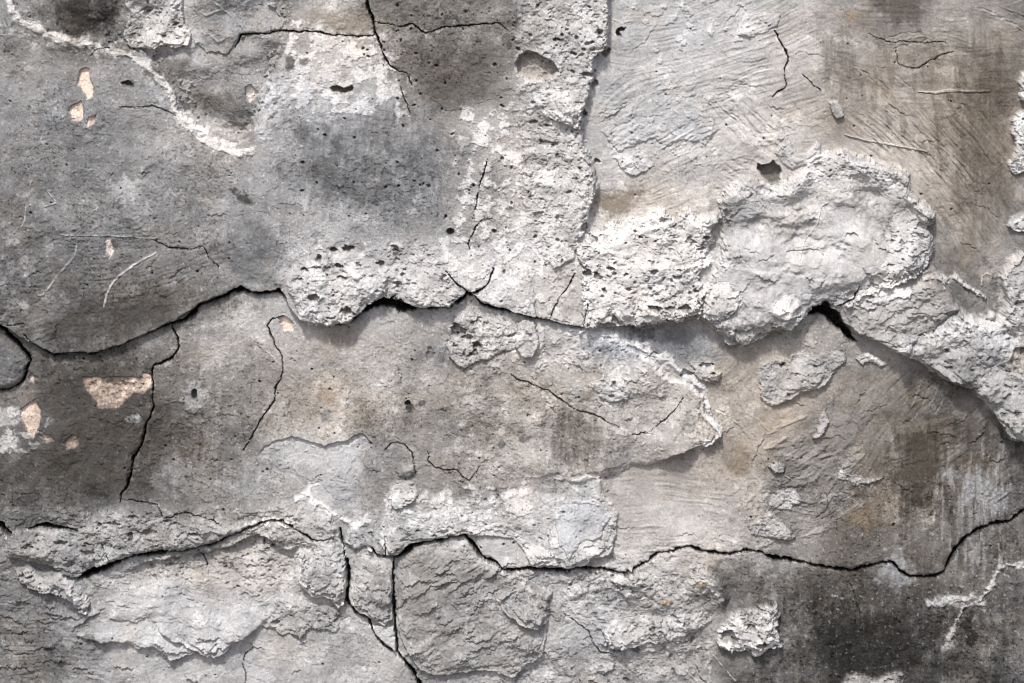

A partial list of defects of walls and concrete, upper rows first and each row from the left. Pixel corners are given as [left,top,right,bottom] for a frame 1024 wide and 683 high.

spalling [6,0,291,159]
crack [234,0,508,116]
crack [772,32,821,98]
crack [867,32,954,70]
crack [333,160,589,329]
peeling [286,0,1024,678]
spalling [20,400,80,450]
spalling [83,372,153,424]
peeling [4,503,259,615]
spalling [78,433,373,661]
crack [0,285,1024,683]
damp [957,463,1010,526]